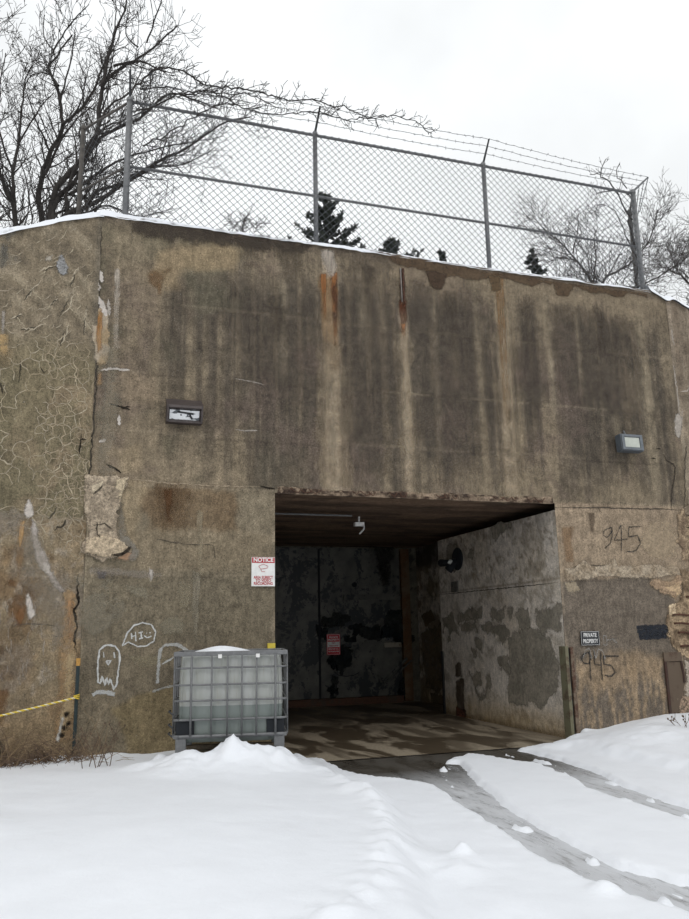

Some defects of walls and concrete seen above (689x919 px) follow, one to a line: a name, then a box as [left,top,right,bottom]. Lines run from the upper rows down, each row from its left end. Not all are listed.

water stain [98,269,119,316]
water stain [132,219,311,252]
rust [320,249,339,333]
water stain [378,251,647,298]
water stain [673,366,689,438]
crack [0,265,274,649]
spalling [81,474,132,562]
peeling [565,504,689,713]
peeling [316,602,562,716]